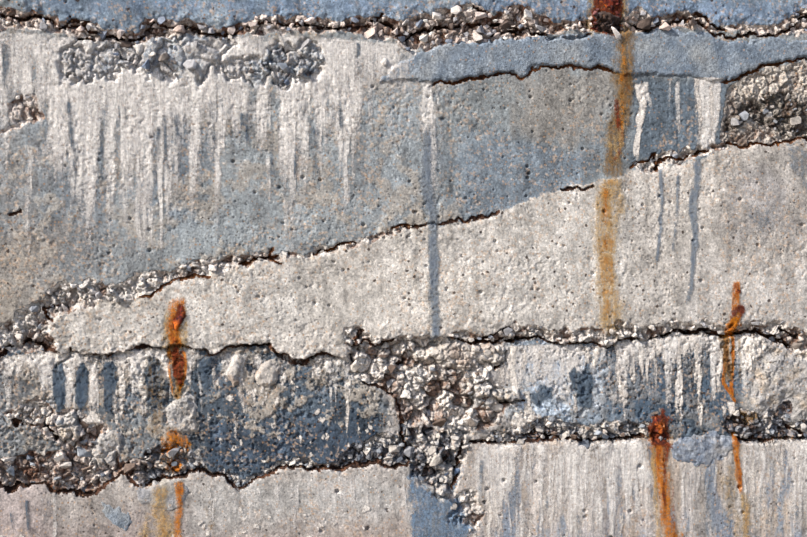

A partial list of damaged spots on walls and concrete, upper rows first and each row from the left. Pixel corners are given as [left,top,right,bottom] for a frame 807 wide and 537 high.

crack [0,5,548,78]
peeling [0,3,807,173]
water stain [694,77,721,149]
crack [630,12,807,40]
water stain [0,32,447,347]
rust [587,0,635,331]
rust [161,298,188,399]
spalling [0,318,807,533]
crack [450,326,798,370]
water stain [498,334,767,434]
rust [718,281,745,402]
water stain [402,440,654,537]